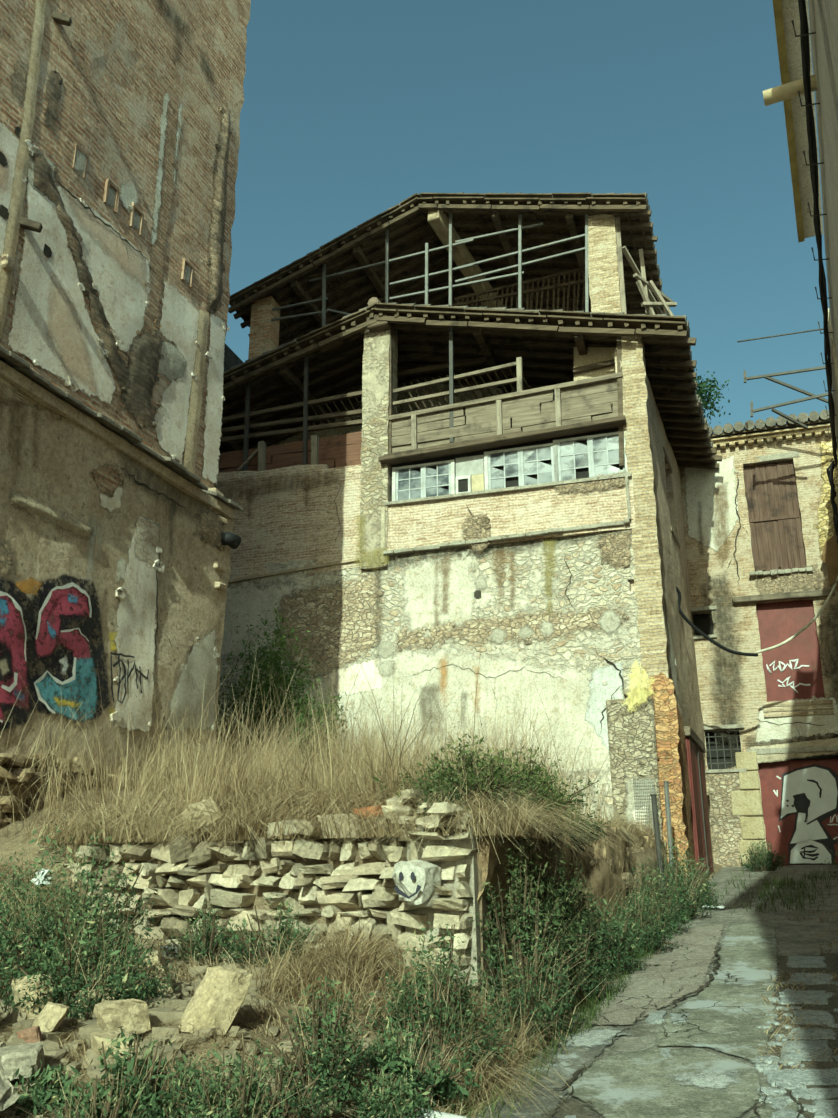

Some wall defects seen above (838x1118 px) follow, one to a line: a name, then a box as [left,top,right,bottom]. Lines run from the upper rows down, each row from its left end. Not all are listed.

spalling [10,61,29,102]
spalling [43,70,63,131]
peeling [0,94,231,484]
flaking render [91,463,124,512]
spalling [598,530,632,568]
peeling [684,456,739,552]
crack [726,474,748,584]
peeling [110,516,165,732]
peeling [167,579,296,731]
peeling [279,513,624,777]
crack [593,642,627,729]
damp [704,578,740,737]